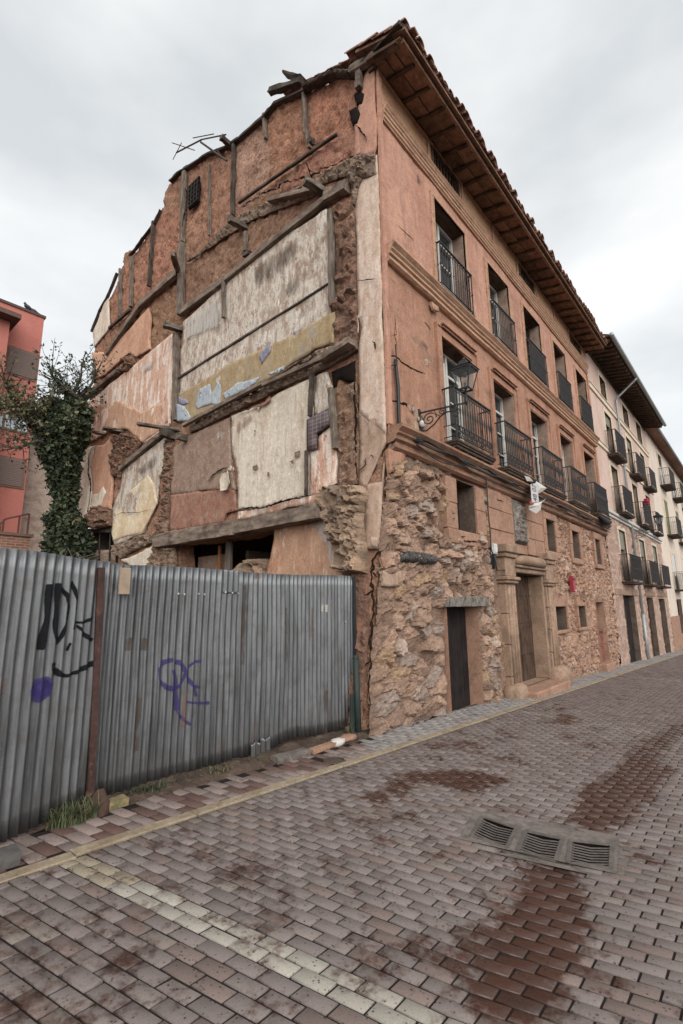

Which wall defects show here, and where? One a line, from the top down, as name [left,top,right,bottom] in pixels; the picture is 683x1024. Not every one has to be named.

flaking render [111,475,158,541]
crack [364,543,390,710]